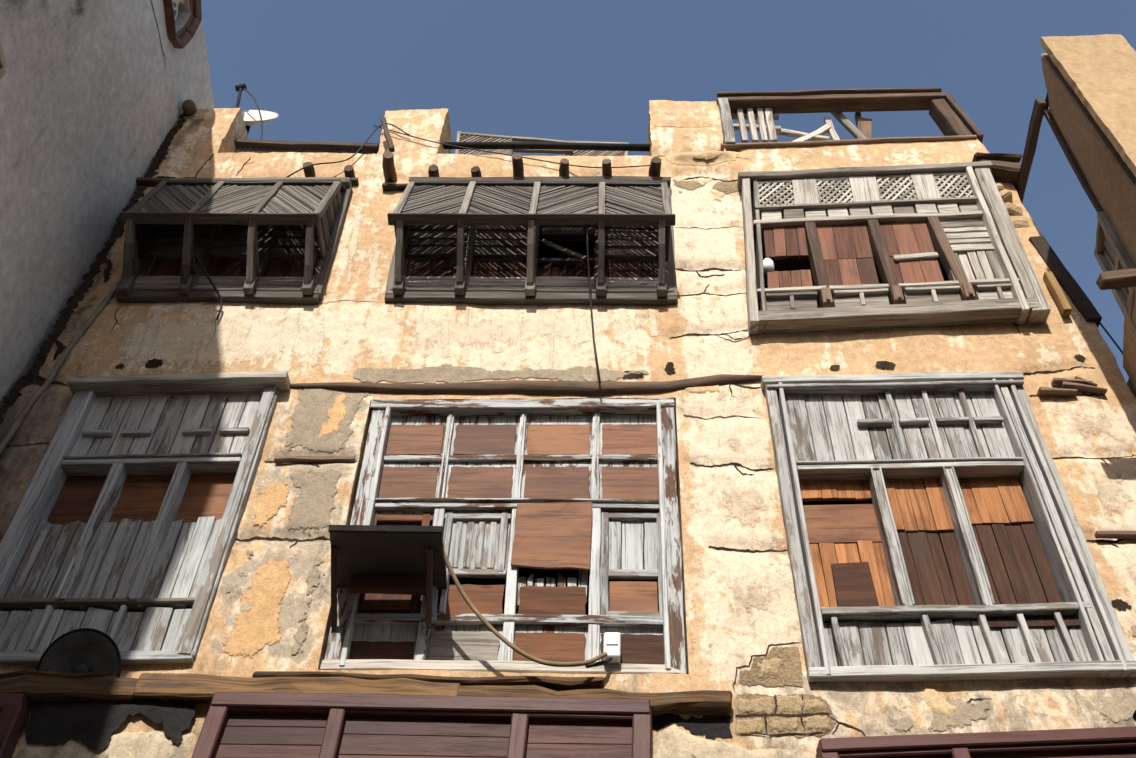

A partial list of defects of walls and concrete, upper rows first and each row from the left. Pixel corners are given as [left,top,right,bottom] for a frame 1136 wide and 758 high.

crack [676,267,745,296]
crack [670,329,751,342]
flaking render [285,363,649,453]
flaking render [252,468,341,535]
peeling [222,550,325,658]
flaking render [652,647,836,739]